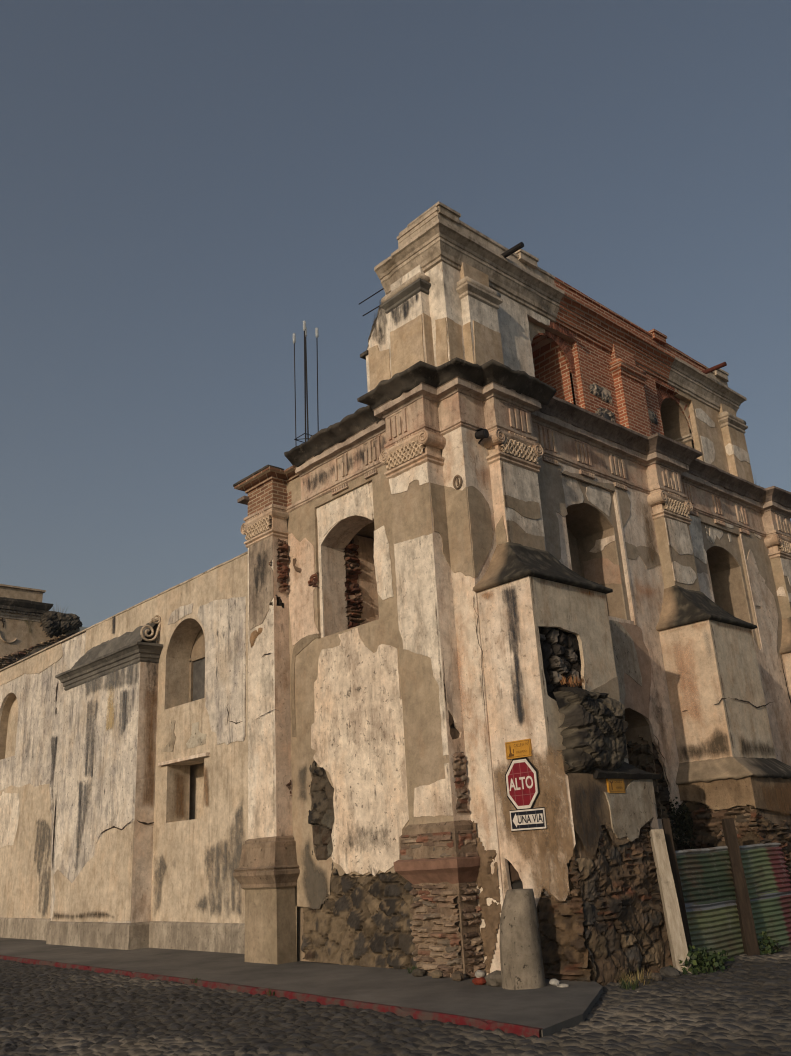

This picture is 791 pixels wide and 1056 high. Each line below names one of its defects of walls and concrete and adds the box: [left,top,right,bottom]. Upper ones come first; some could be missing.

flaking render [249,536,319,648]
leakage [75,660,157,868]
flaking render [443,711,460,739]
leakage [502,586,524,725]
crack [714,657,791,708]
leakage [34,820,107,918]
flaking render [447,752,523,974]